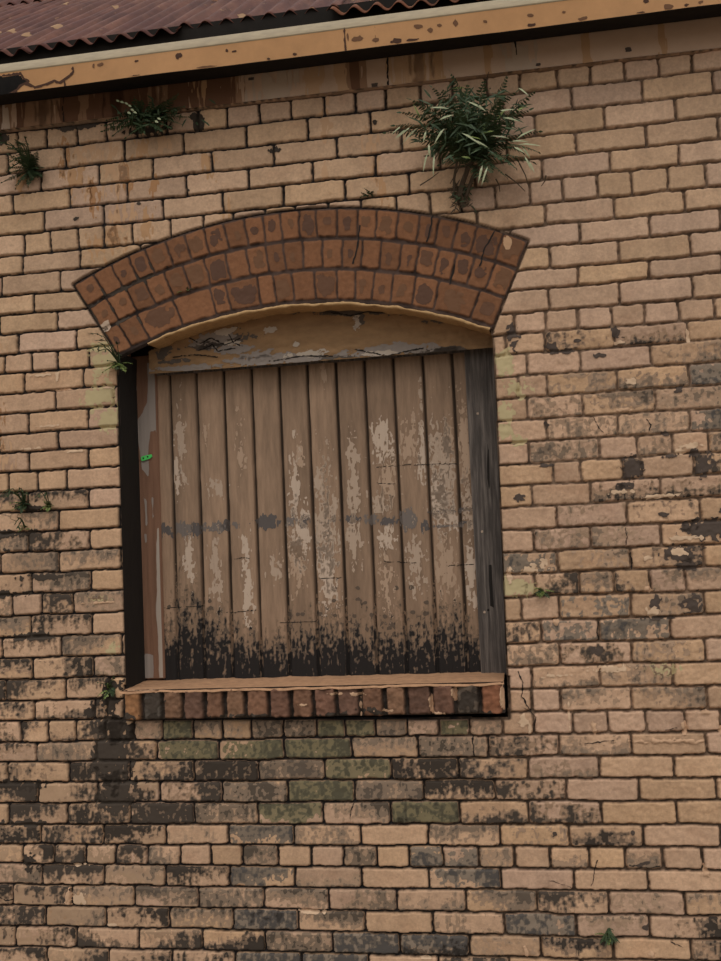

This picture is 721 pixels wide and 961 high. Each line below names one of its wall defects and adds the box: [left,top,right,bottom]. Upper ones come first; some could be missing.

peeling [173,399,189,502]
peeling [206,406,247,500]
peeling [138,327,441,476]
peeling [264,376,478,631]
peeling [182,524,223,626]
peeling [238,528,256,634]
leakage [164,552,481,680]
leakage [0,646,41,750]
leakage [64,657,105,688]
leakage [392,735,633,846]
leakage [0,742,258,961]
mould [542,937,612,951]